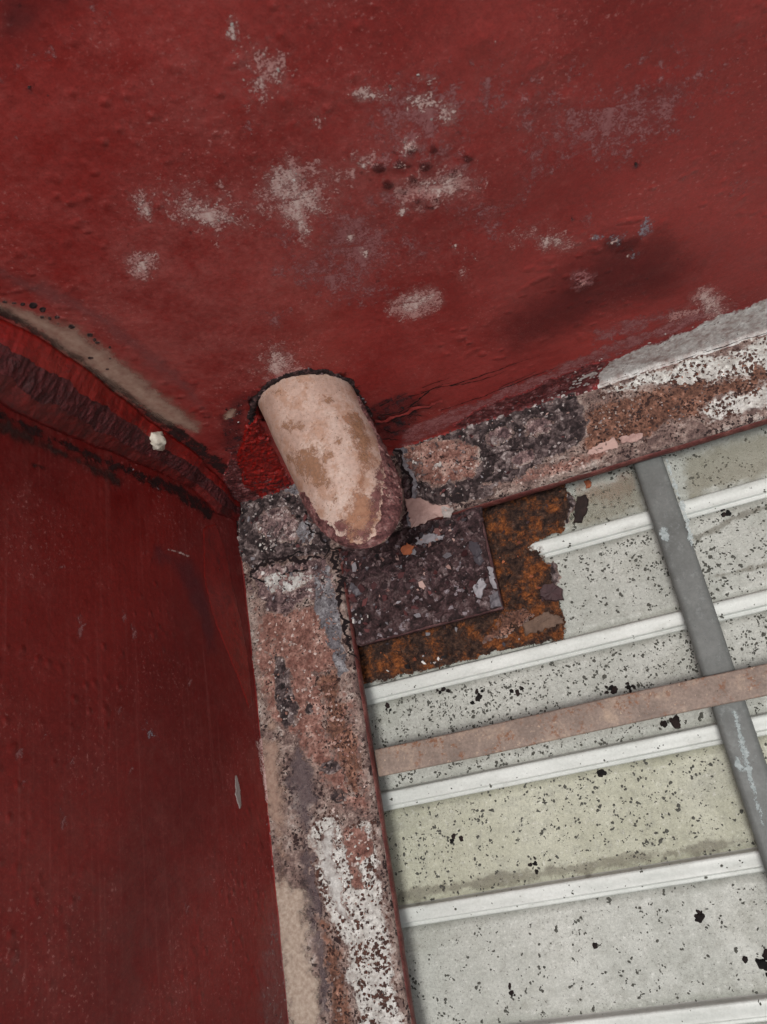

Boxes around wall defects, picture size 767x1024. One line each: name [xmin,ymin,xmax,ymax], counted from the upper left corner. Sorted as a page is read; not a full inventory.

mould [0,407,215,519]
leakage [0,301,227,477]
peeling [361,285,767,447]
crack [236,511,360,661]
rust [221,359,767,890]
rust [275,881,356,1024]